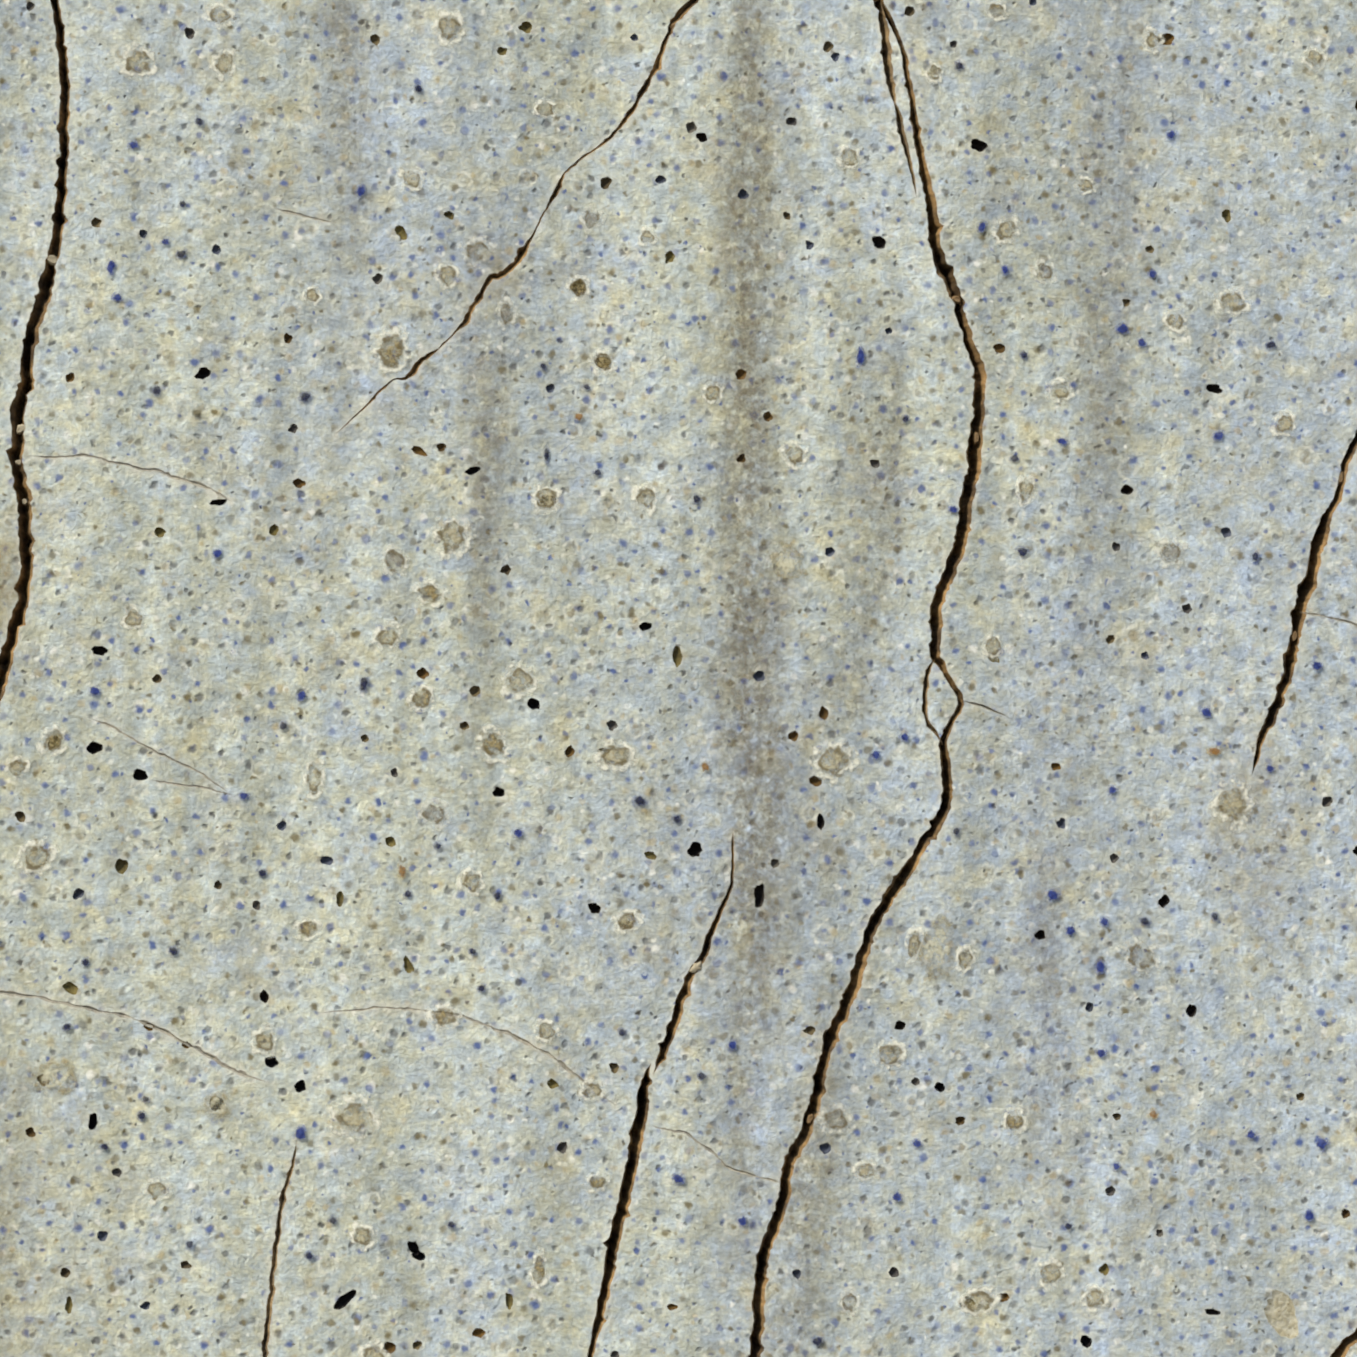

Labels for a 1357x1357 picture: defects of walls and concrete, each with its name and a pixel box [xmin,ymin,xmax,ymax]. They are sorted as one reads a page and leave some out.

crack [0,0,230,701]
crack [88,717,231,795]
crack [325,0,1009,1357]
crack [1252,430,1357,774]
crack [261,1140,297,1357]
crack [1330,1328,1357,1357]